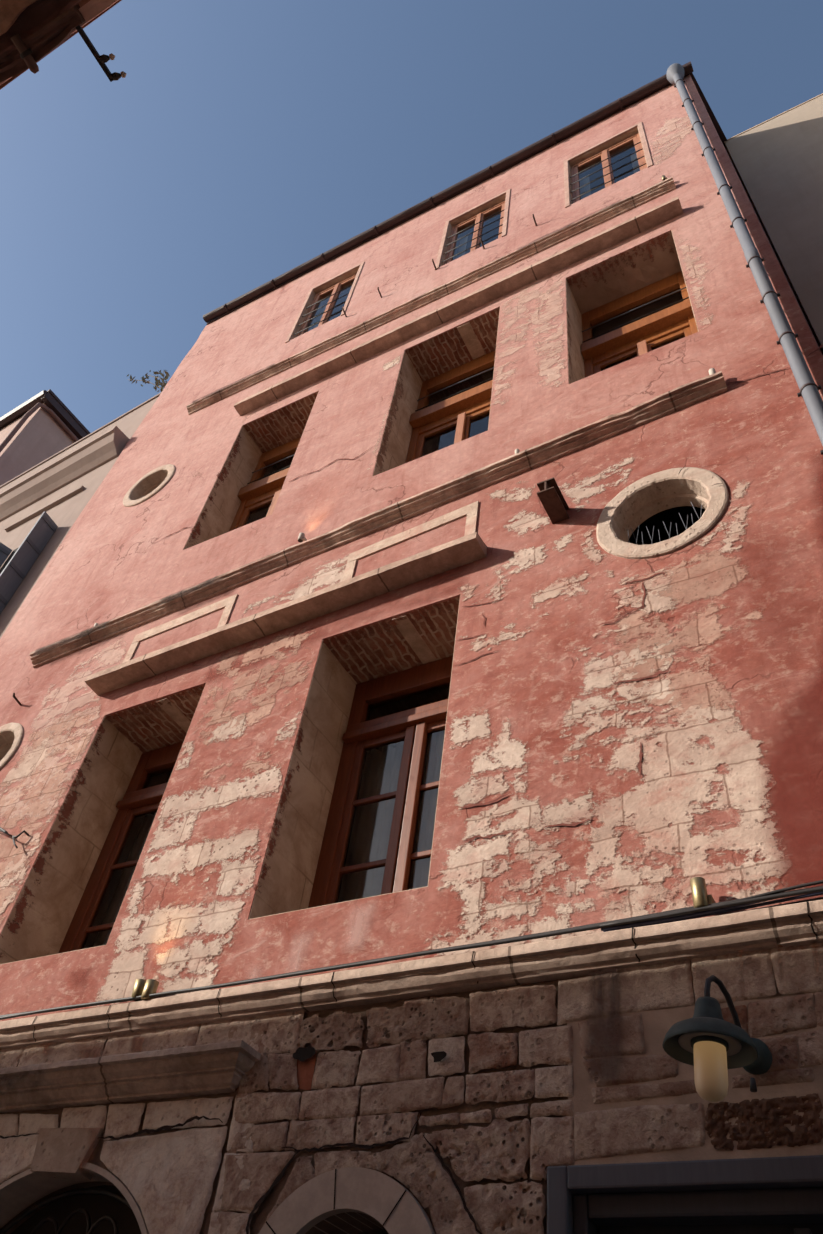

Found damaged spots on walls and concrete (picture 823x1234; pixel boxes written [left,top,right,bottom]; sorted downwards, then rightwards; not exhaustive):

peeling [187,433,241,547]
flaking render [558,455,634,512]
flaking render [0,481,805,1007]
crack [246,1113,482,1234]